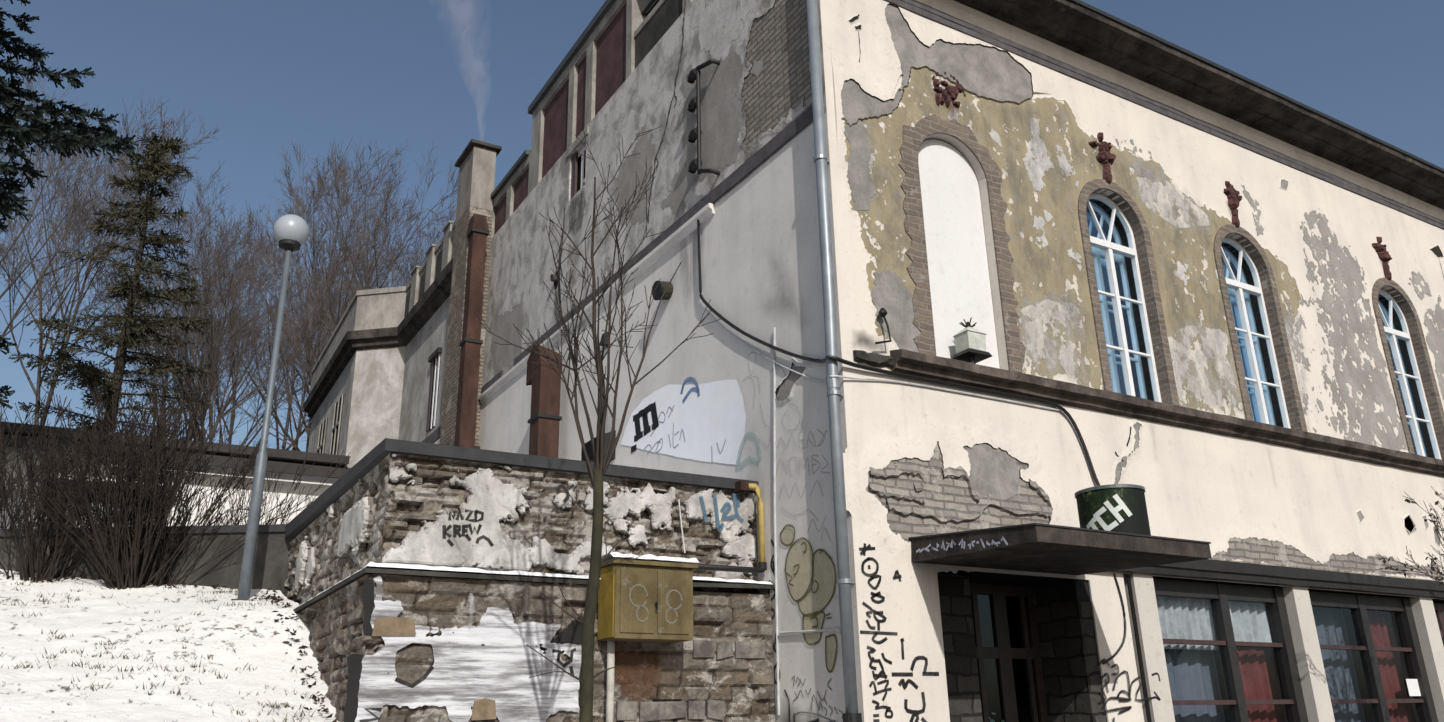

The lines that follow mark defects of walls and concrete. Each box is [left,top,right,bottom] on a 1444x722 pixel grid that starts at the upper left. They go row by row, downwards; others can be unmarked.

crack [646,2,686,234]
flaking render [610,0,812,225]
peeling [831,0,1408,451]
flaking render [1428,245,1444,259]
peeling [490,302,524,376]
flaking render [775,357,811,407]
peeling [1408,271,1444,400]
flaking render [326,497,374,557]
flaking render [389,454,417,491]
flaking render [843,408,1073,574]
flaking render [355,465,757,722]